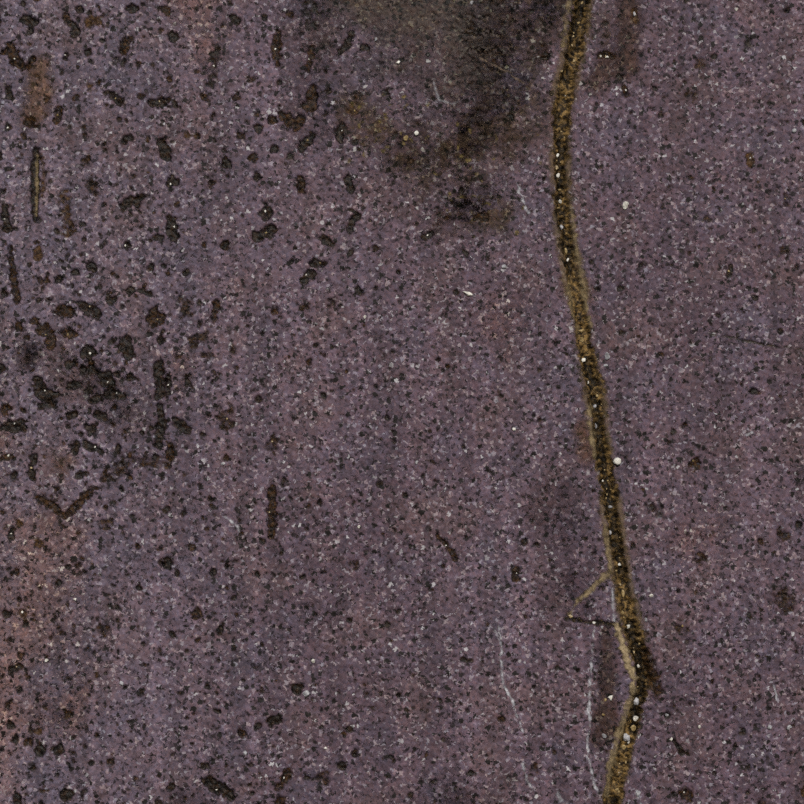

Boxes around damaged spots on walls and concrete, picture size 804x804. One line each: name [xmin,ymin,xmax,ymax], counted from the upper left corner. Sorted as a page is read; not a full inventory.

damp [327,0,503,100]
crack [481,0,664,804]